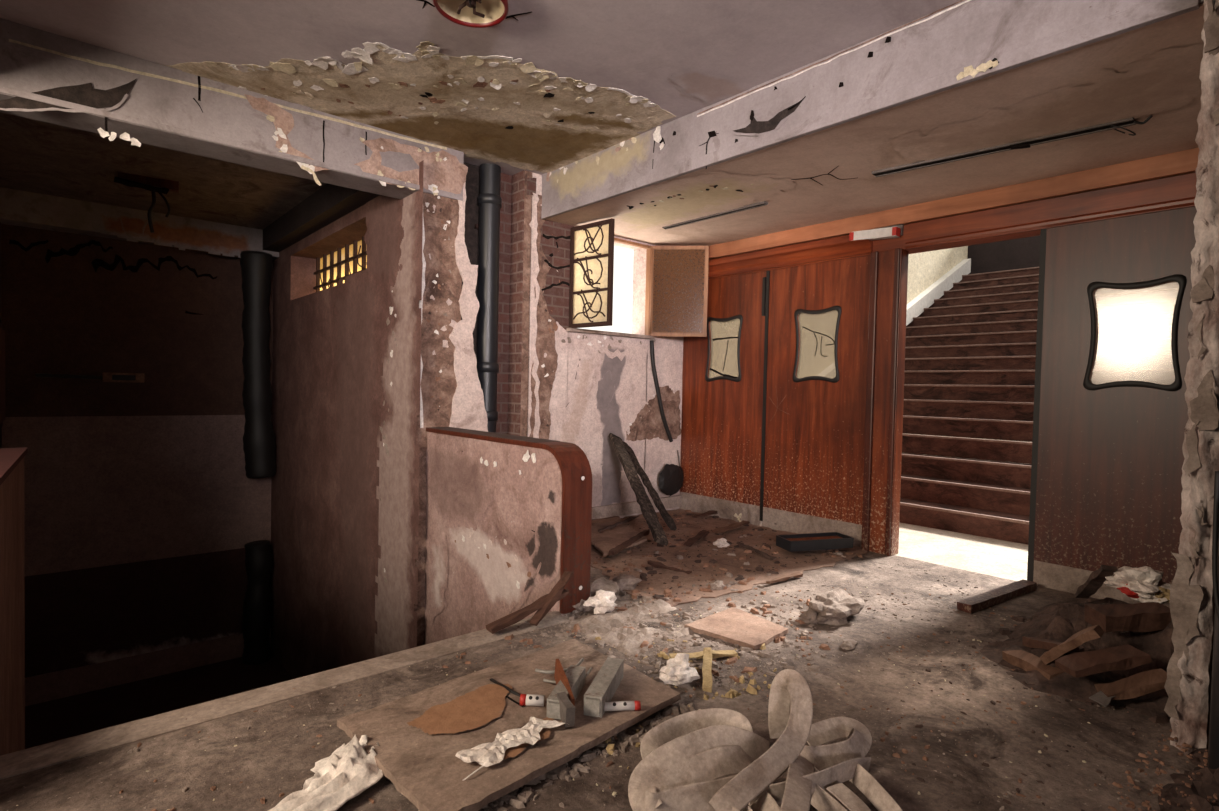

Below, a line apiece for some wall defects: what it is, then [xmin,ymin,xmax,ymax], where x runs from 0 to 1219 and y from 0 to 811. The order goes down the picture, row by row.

crack [9,39,447,162]
peeling [155,41,676,186]
crack [697,0,971,169]
spalling [1203,0,1219,56]
crack [9,240,217,279]
spalling [519,178,655,475]
spalling [1190,265,1214,359]
flaking render [354,137,488,658]
spalling [626,385,681,441]
spalling [1183,370,1219,477]
spalling [1164,504,1208,719]